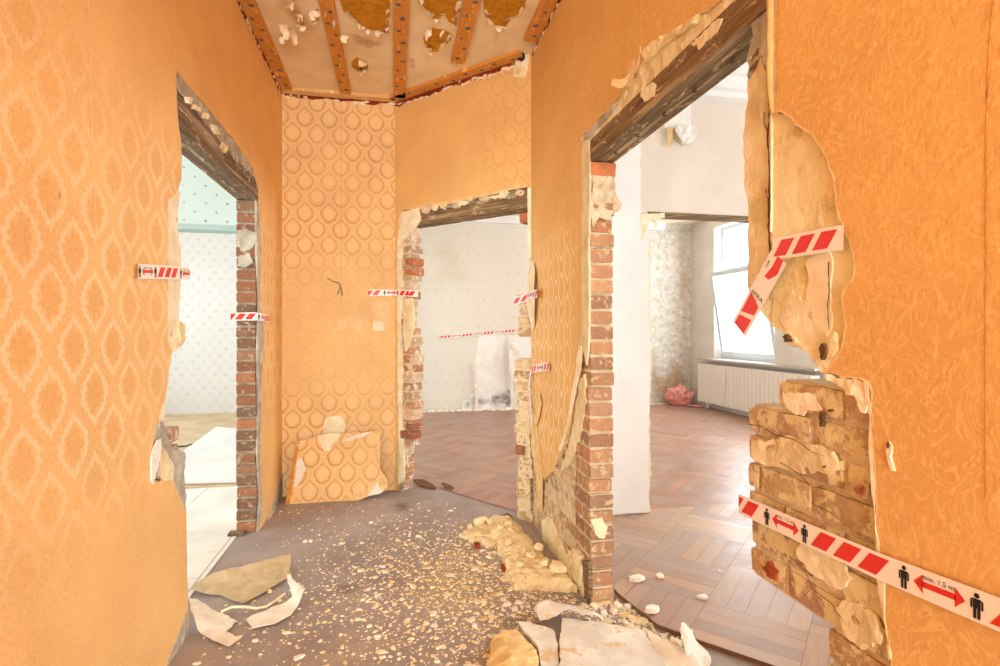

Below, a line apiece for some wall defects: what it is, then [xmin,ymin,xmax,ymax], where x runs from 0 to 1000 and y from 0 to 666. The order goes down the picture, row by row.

peeling [278,0,391,45]
peeling [351,57,370,77]
peeling [418,0,462,56]
peeling [483,0,526,32]
spalling [514,53,529,78]
spalling [583,0,734,147]
flaking render [748,0,880,553]
spalling [150,421,187,510]
spalling [533,374,593,600]
crack [749,424,845,524]
crack [789,556,847,626]
flaking render [751,520,892,666]